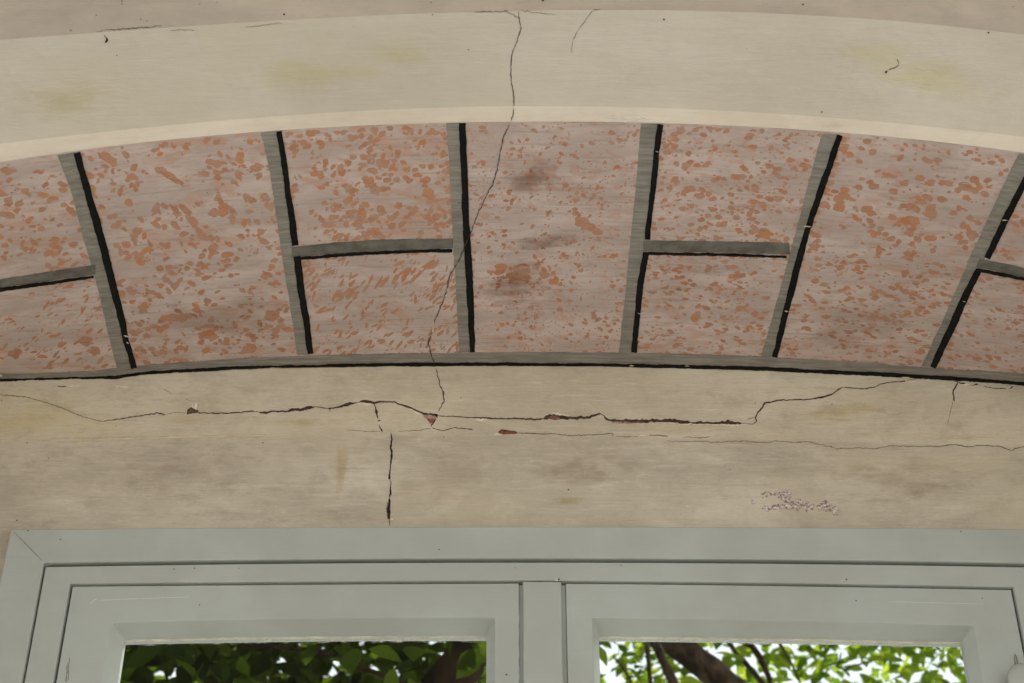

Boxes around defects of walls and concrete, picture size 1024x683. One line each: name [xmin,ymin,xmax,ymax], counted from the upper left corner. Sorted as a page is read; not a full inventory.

crack [0,10,1024,525]
peeling [751,490,838,516]